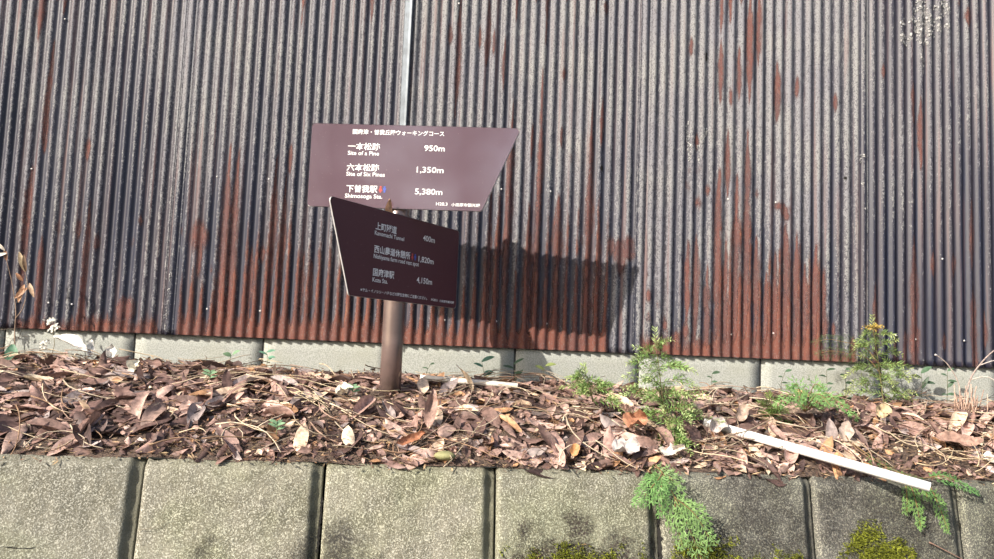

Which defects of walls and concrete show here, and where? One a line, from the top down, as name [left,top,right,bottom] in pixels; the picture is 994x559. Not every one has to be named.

corrosion [718,0,762,105]
corrosion [16,167,157,334]
corrosion [176,145,382,343]
corrosion [403,69,635,352]
corrosion [640,130,856,362]
leakage [513,512,654,559]
leakage [817,477,949,559]